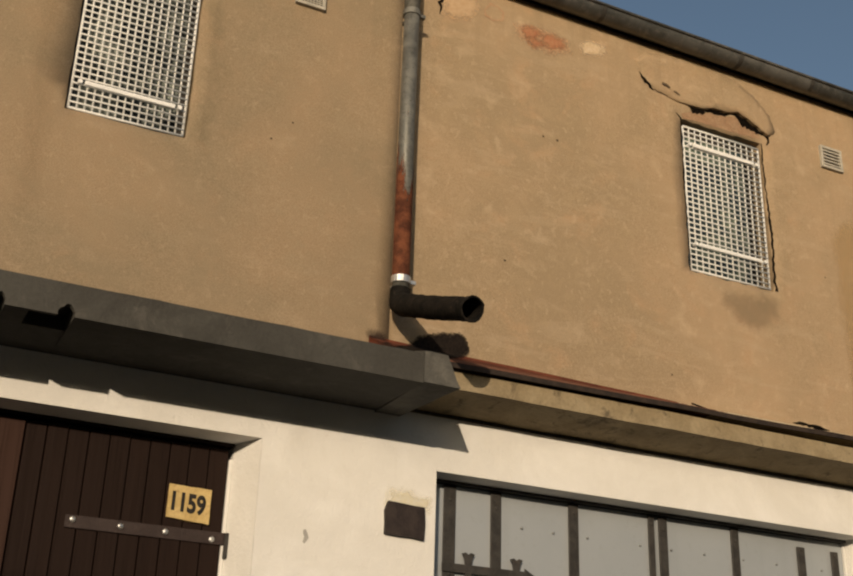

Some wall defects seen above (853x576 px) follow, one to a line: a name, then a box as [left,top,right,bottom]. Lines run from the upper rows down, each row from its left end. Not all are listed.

spalling [517,26,569,53]
spalling [579,42,605,55]
spalling [681,111,761,140]
corrosion [392,145,414,276]